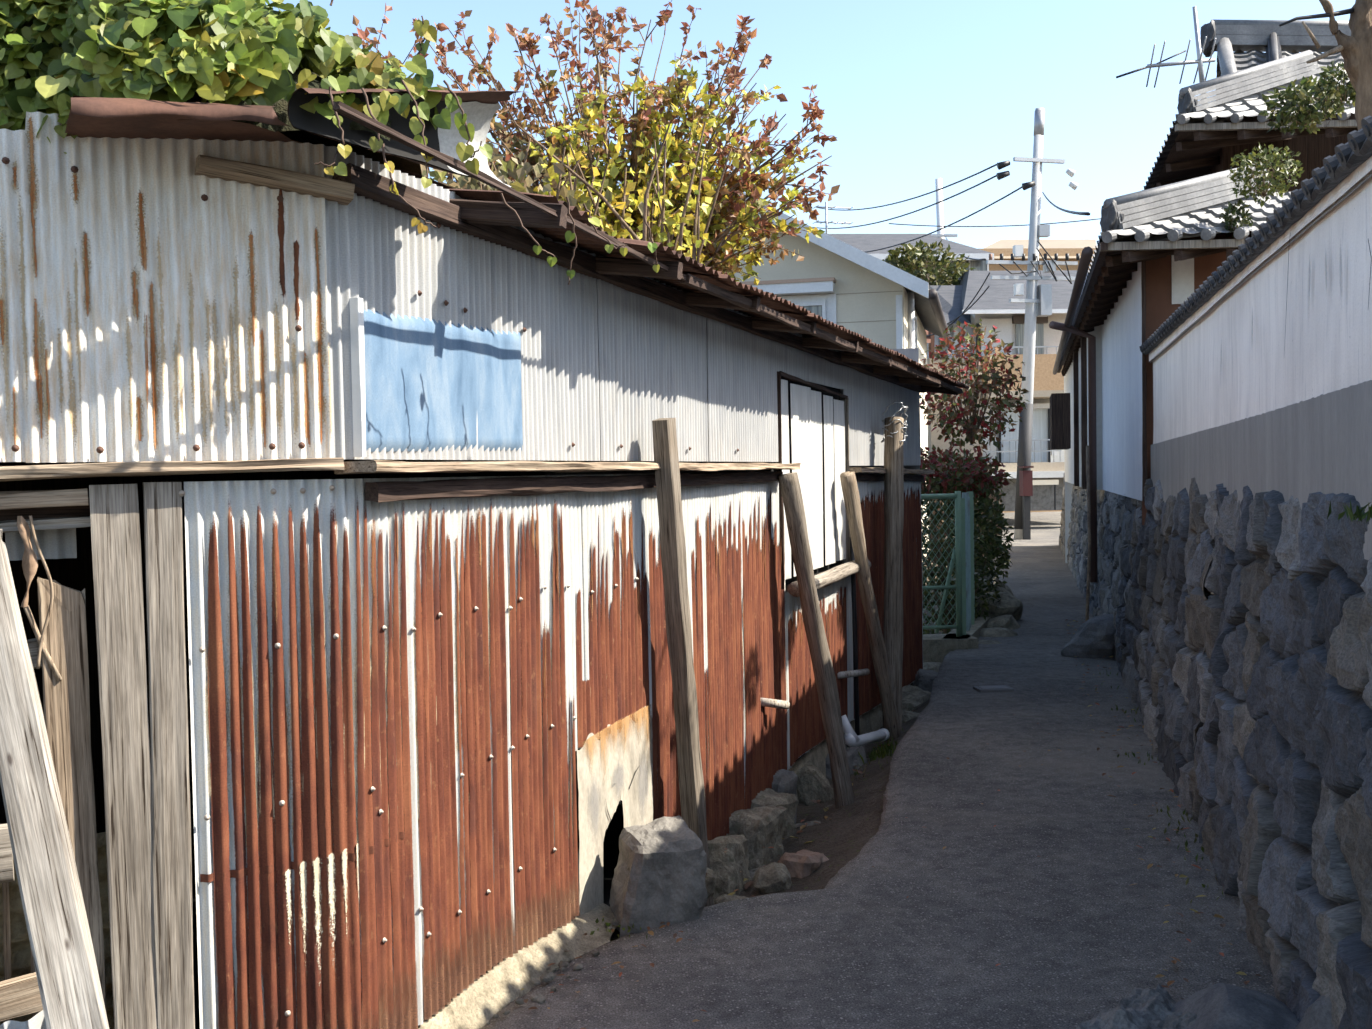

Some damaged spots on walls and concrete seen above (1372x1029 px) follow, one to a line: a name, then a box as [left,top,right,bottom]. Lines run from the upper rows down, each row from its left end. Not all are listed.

corrosion [0,117,91,445]
corrosion [126,189,332,449]
corrosion [207,500,681,1029]
corrosion [691,491,826,840]
corrosion [820,490,885,719]
corrosion [902,487,923,687]